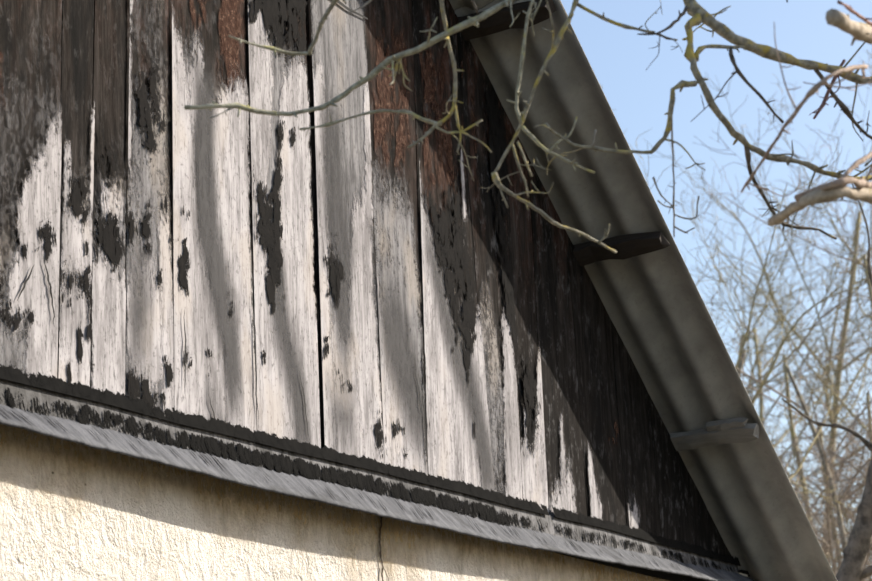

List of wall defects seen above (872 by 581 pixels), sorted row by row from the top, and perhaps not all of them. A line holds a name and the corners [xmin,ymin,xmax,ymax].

peeling [482,75,509,190]
peeling [0,0,492,501]
peeling [420,178,741,566]
peeling [7,387,548,533]
crack [379,517,389,581]